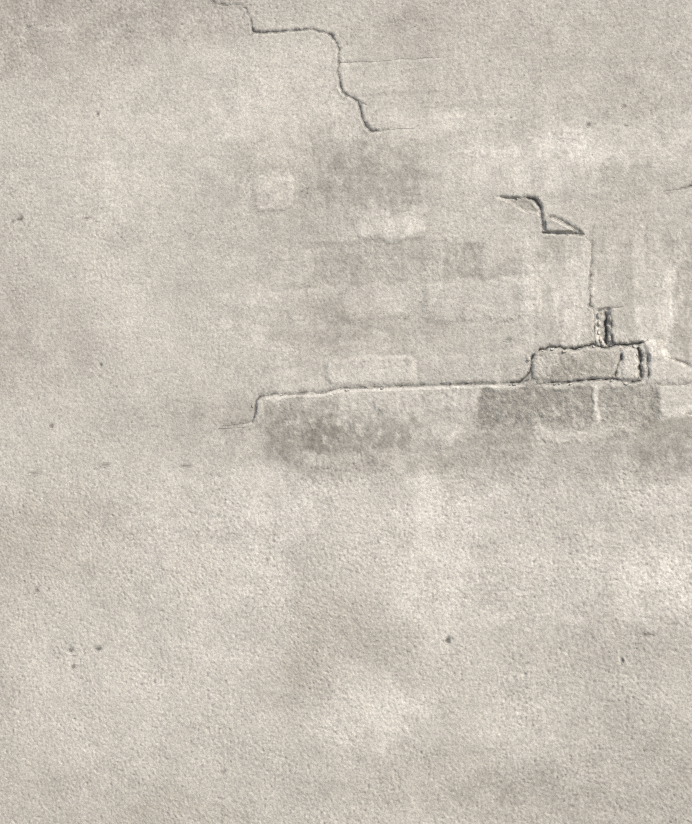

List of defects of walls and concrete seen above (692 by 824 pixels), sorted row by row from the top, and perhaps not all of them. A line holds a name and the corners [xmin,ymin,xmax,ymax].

crack [211,0,439,133]
peeling [352,202,427,244]
peeling [340,274,540,326]
water stain [253,385,692,493]